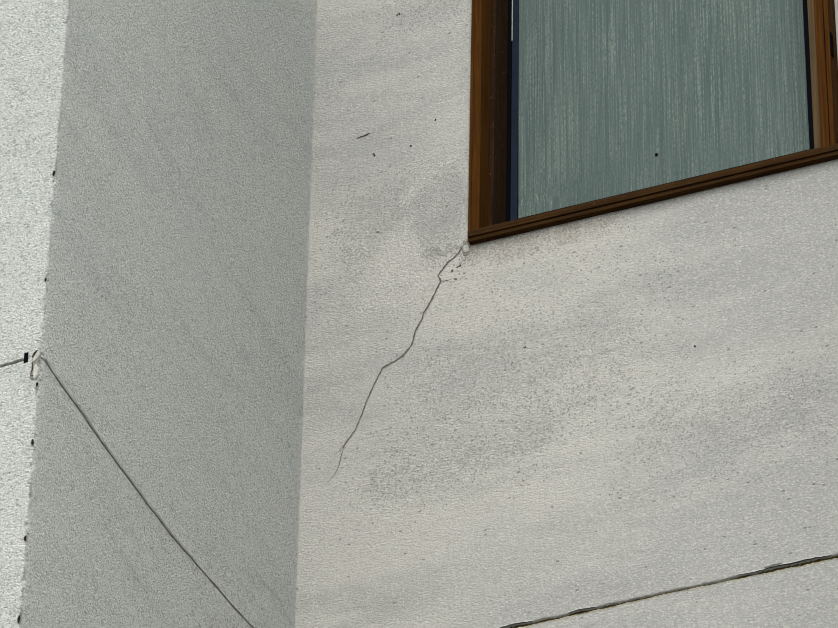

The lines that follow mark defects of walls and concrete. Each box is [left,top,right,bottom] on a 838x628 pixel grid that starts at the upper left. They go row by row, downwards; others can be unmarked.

spalling [30,350,41,386]
crack [325,245,463,486]